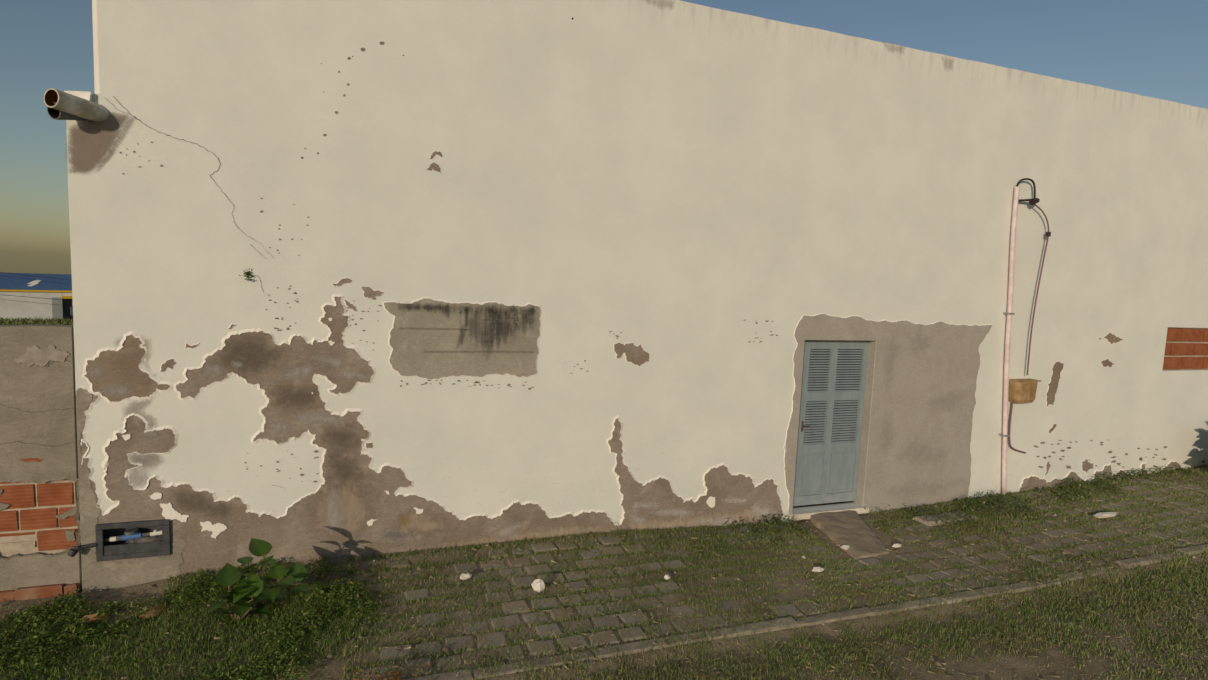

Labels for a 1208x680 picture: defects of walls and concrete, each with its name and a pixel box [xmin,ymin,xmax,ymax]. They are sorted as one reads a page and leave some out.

leakage [70,113,126,172]
crack [104,96,272,296]
peeling [426,151,442,173]
peeling [1046,361,1064,407]
peeling [0,277,783,575]
peeling [1020,423,1181,492]